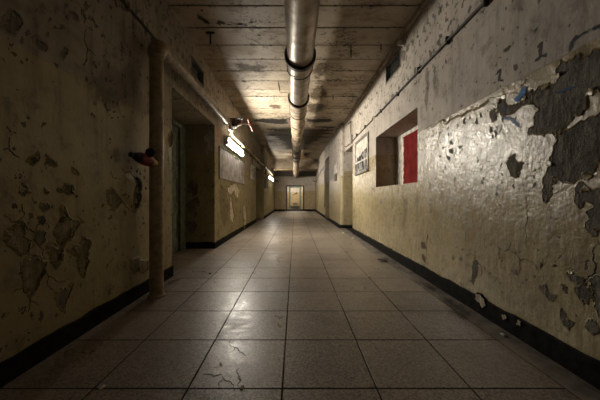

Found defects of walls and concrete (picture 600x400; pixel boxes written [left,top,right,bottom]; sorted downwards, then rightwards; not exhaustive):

peeling [424,46,600,237]
peeling [221,182,247,229]
peeling [19,183,92,298]
spalling [474,292,487,308]
peeling [538,271,600,336]